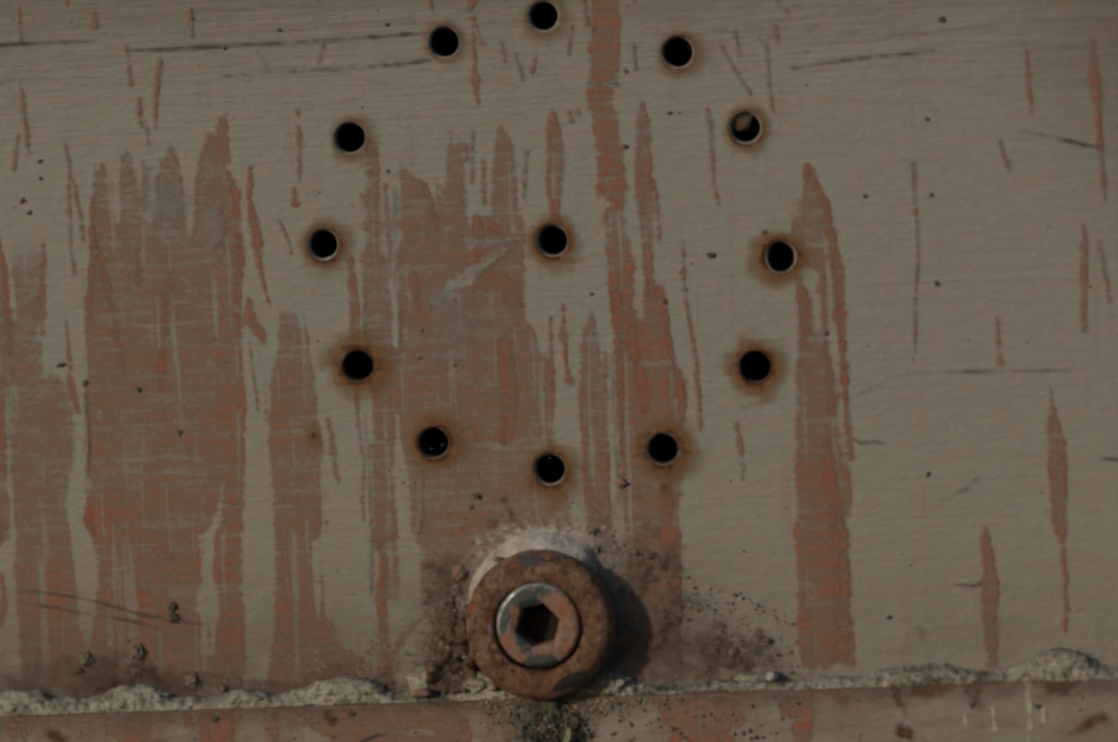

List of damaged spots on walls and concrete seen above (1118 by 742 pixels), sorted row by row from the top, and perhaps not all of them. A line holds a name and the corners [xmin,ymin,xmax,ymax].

corrosion [751,233,806,283]
peeling [0,245,13,545]
peeling [63,108,386,695]
corrosion [326,336,388,391]
peeling [544,0,702,663]
corrosion [728,340,782,395]
peeling [791,163,855,669]
corrosion [637,421,693,490]
peeling [183,709,233,742]